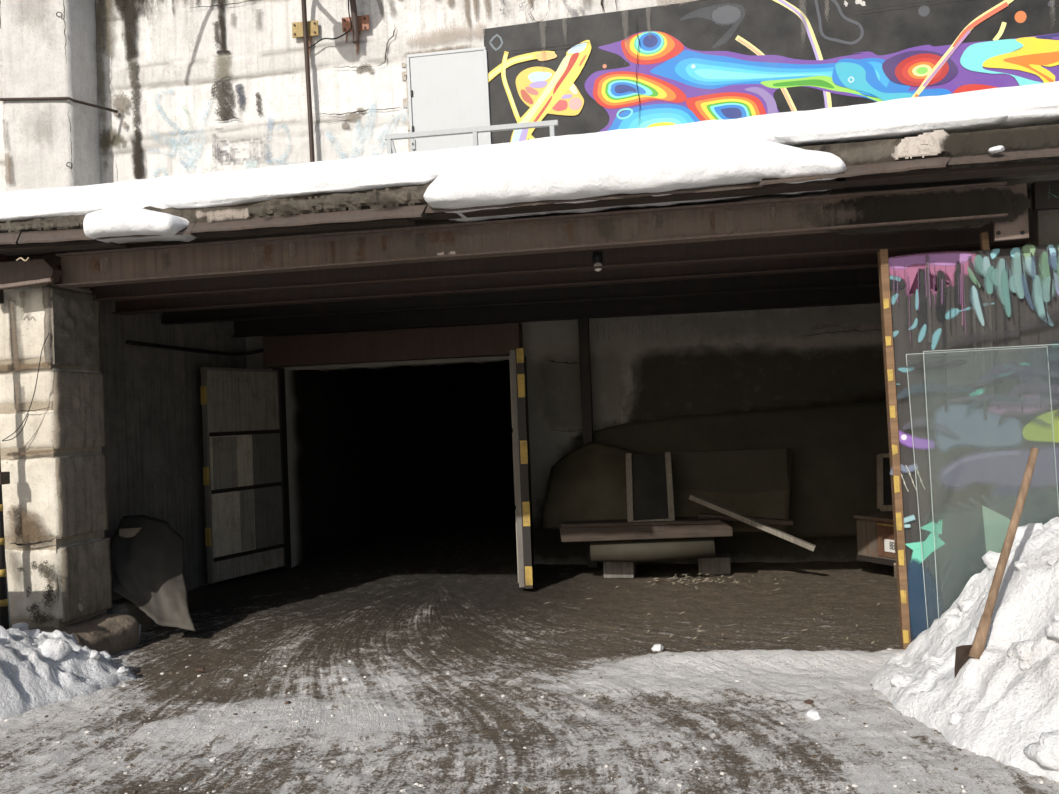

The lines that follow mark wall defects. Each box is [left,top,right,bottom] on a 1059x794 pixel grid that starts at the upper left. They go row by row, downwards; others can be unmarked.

water stain [95,0,152,179]
water stain [197,0,261,120]
crack [345,28,396,68]
water stain [407,0,490,55]